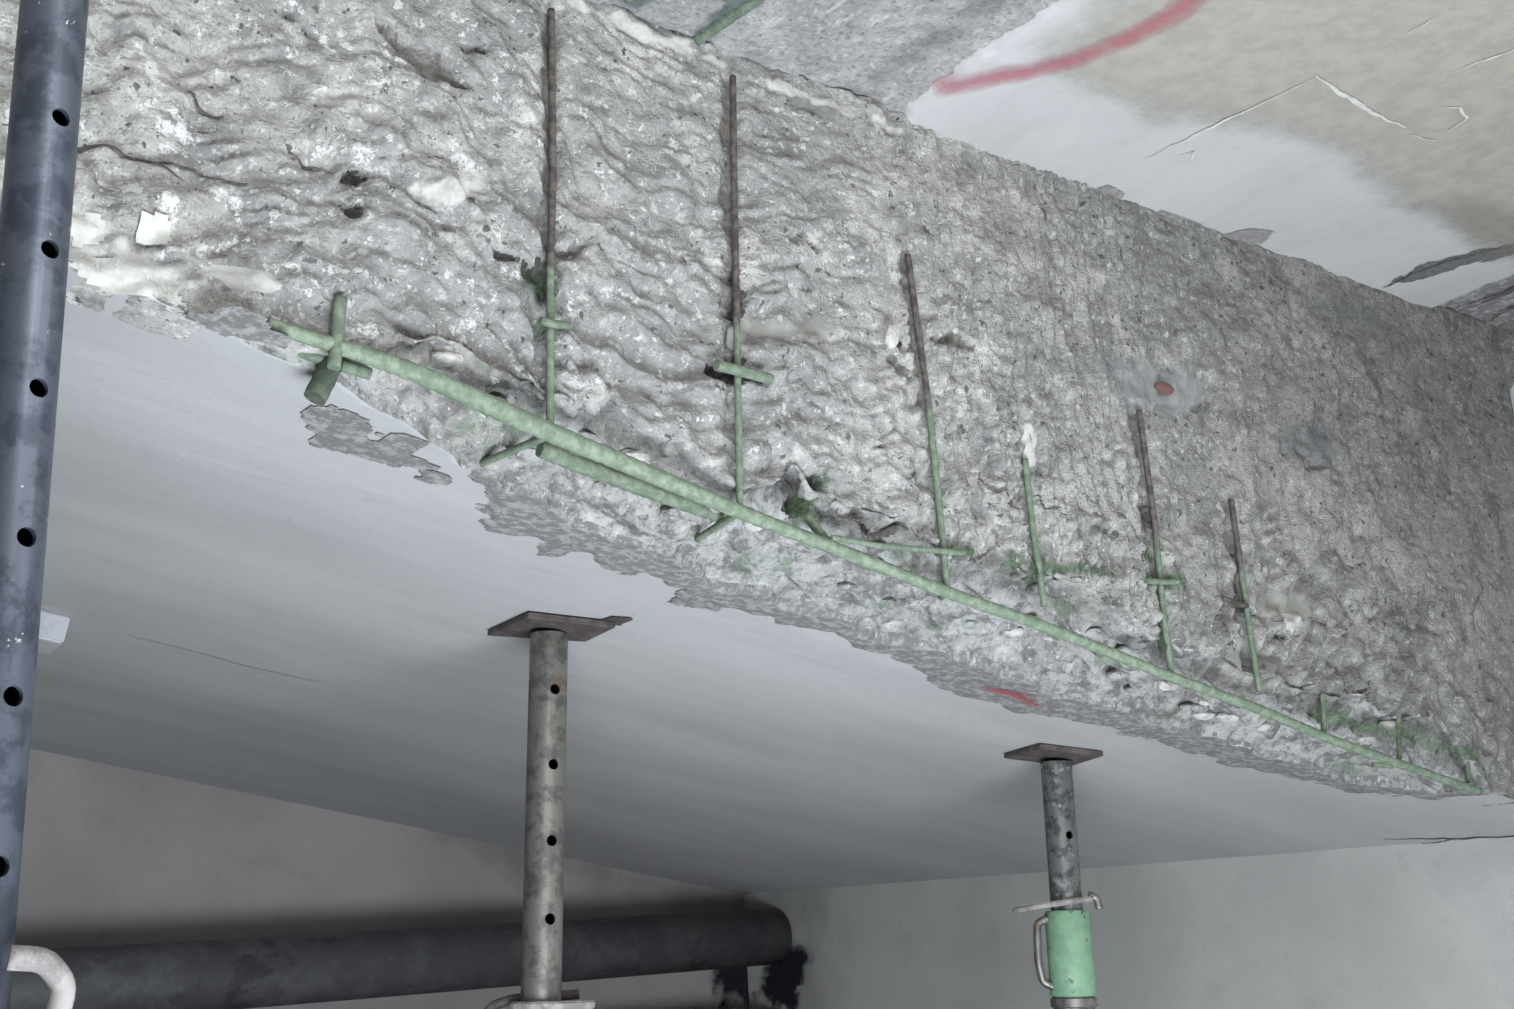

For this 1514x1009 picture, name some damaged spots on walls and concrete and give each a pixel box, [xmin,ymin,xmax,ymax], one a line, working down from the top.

spalling [377,24,486,90]
spalling [566,0,1060,135]
crack [77,144,248,185]
spalling [337,169,368,219]
peeling [408,173,483,231]
peeling [1384,244,1514,288]
flaking render [1497,320,1514,392]
spalling [68,203,1489,800]
water stain [713,946,808,1009]